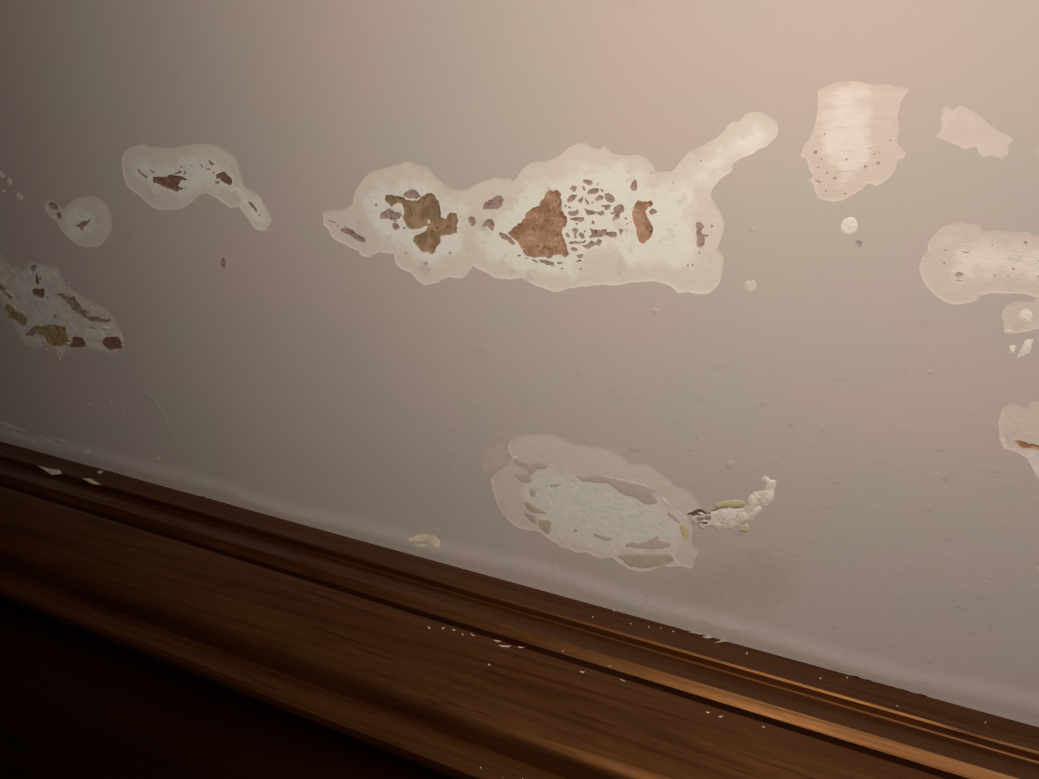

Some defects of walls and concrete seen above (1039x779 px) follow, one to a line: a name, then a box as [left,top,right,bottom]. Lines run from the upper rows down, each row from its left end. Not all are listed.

peeling [44,196,112,247]
peeling [122,143,272,231]
peeling [323,112,778,294]
peeling [800,81,909,202]
peeling [934,104,1015,159]
spalling [0,250,128,361]
peeling [919,221,1039,358]
peeling [998,400,1039,478]
peeling [491,434,777,572]